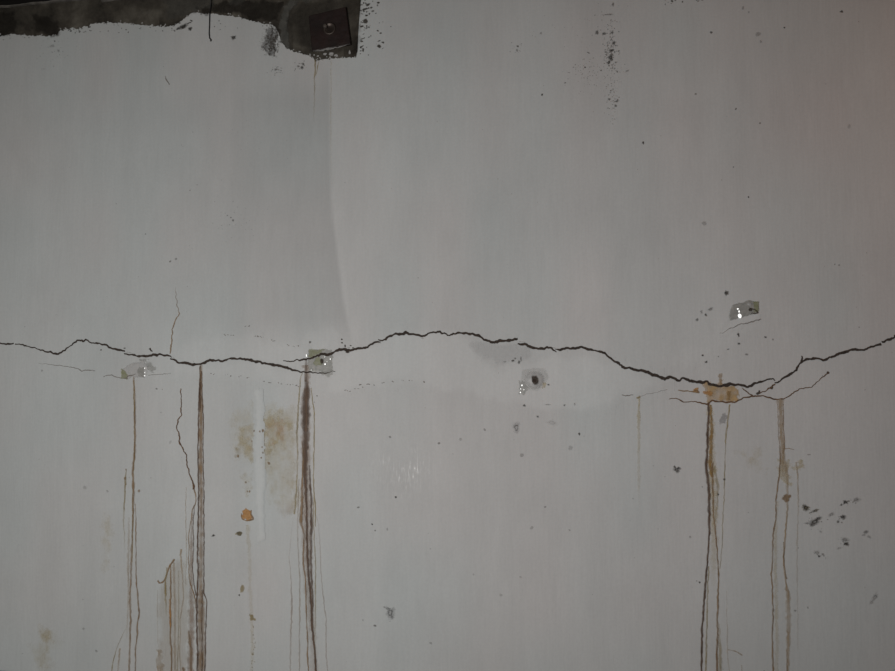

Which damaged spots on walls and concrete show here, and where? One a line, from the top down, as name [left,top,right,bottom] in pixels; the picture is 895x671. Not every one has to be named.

peeling [0,0,384,62]
crack [0,304,895,405]
rust [124,395,140,671]
rust [157,369,207,671]
crack [176,389,195,489]
rust [241,509,254,521]
rust [294,365,317,671]
rust [678,380,739,671]
rust [772,399,794,549]
rust [770,553,789,671]